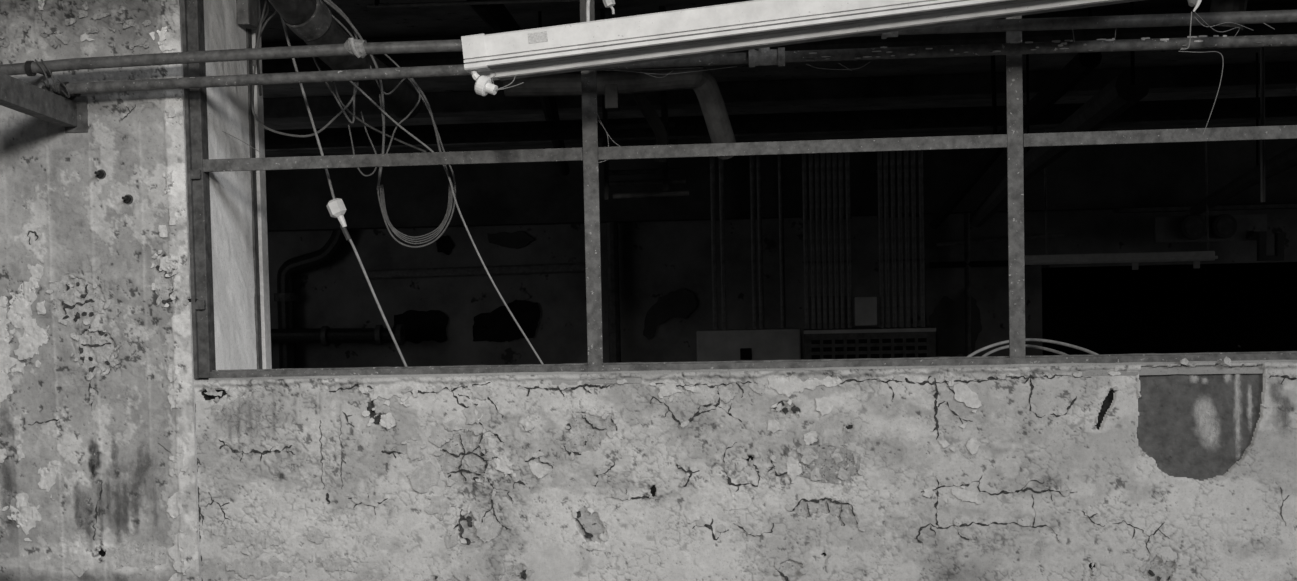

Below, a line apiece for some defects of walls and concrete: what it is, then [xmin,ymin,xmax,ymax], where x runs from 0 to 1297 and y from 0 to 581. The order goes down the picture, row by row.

peeling [23,2,174,52]
peeling [0,259,121,408]
peeling [0,444,25,463]
peeling [2,460,61,541]
crack [158,377,788,581]
crack [824,371,1090,440]
crack [916,477,1170,553]
spalling [1095,367,1121,430]
spalling [1137,356,1269,487]
crack [1269,375,1297,384]